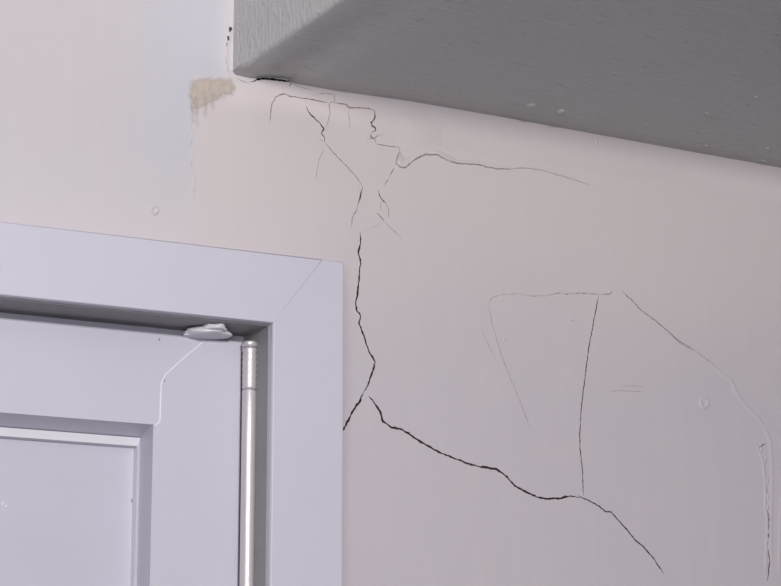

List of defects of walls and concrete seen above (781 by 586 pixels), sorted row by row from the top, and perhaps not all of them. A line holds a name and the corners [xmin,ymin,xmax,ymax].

crack [235,77,717,572]